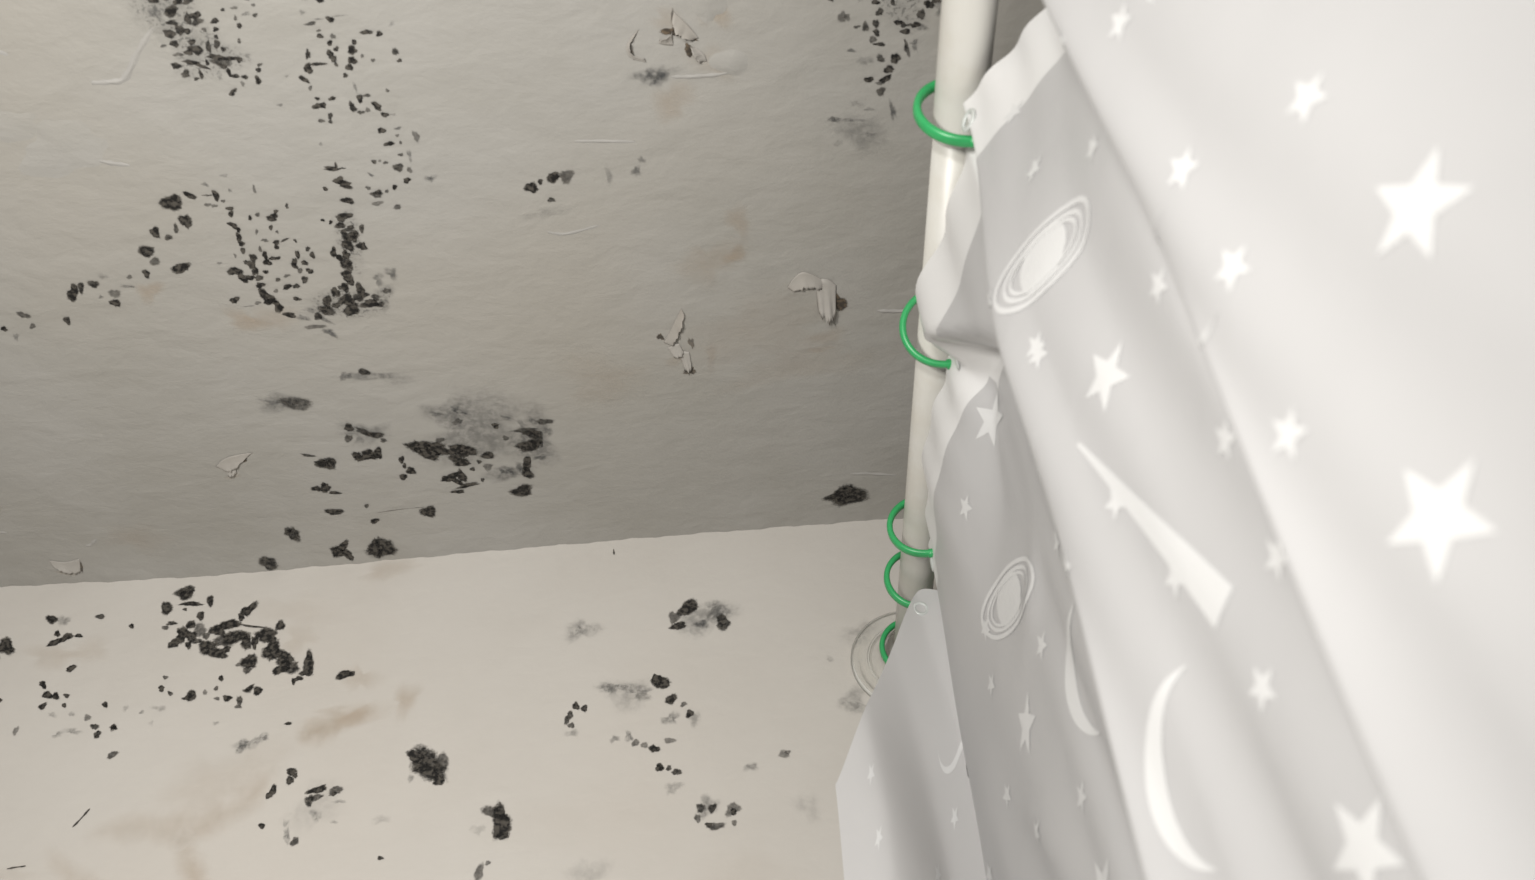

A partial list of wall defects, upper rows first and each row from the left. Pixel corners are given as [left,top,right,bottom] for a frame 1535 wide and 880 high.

peeling [659,12,706,63]
damp [854,0,942,115]
damp [138,0,411,336]
peeling [787,272,847,325]
peeling [657,309,695,374]
damp [302,419,553,515]
damp [331,504,397,561]
damp [669,599,730,631]
damp [158,585,314,708]
damp [651,674,694,718]
damp [407,747,448,785]
damp [482,802,511,840]